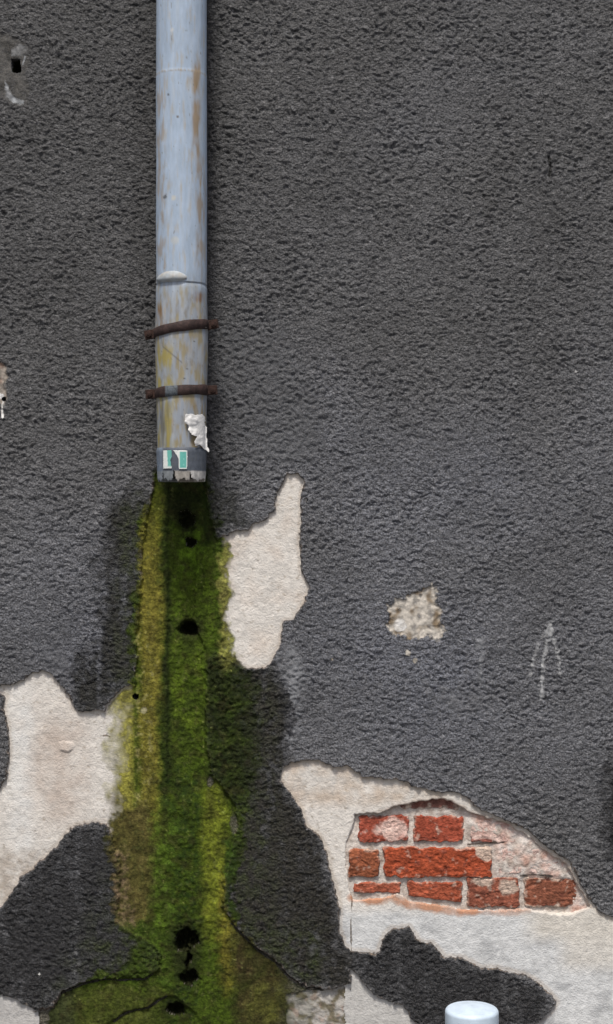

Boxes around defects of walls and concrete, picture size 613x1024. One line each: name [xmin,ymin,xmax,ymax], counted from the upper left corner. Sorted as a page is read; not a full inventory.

leakage [73,497,149,711]
peeling [222,474,309,668]
spalling [386,583,446,663]
leakage [0,830,138,1007]
peeling [0,670,147,907]
peeling [280,760,613,1024]